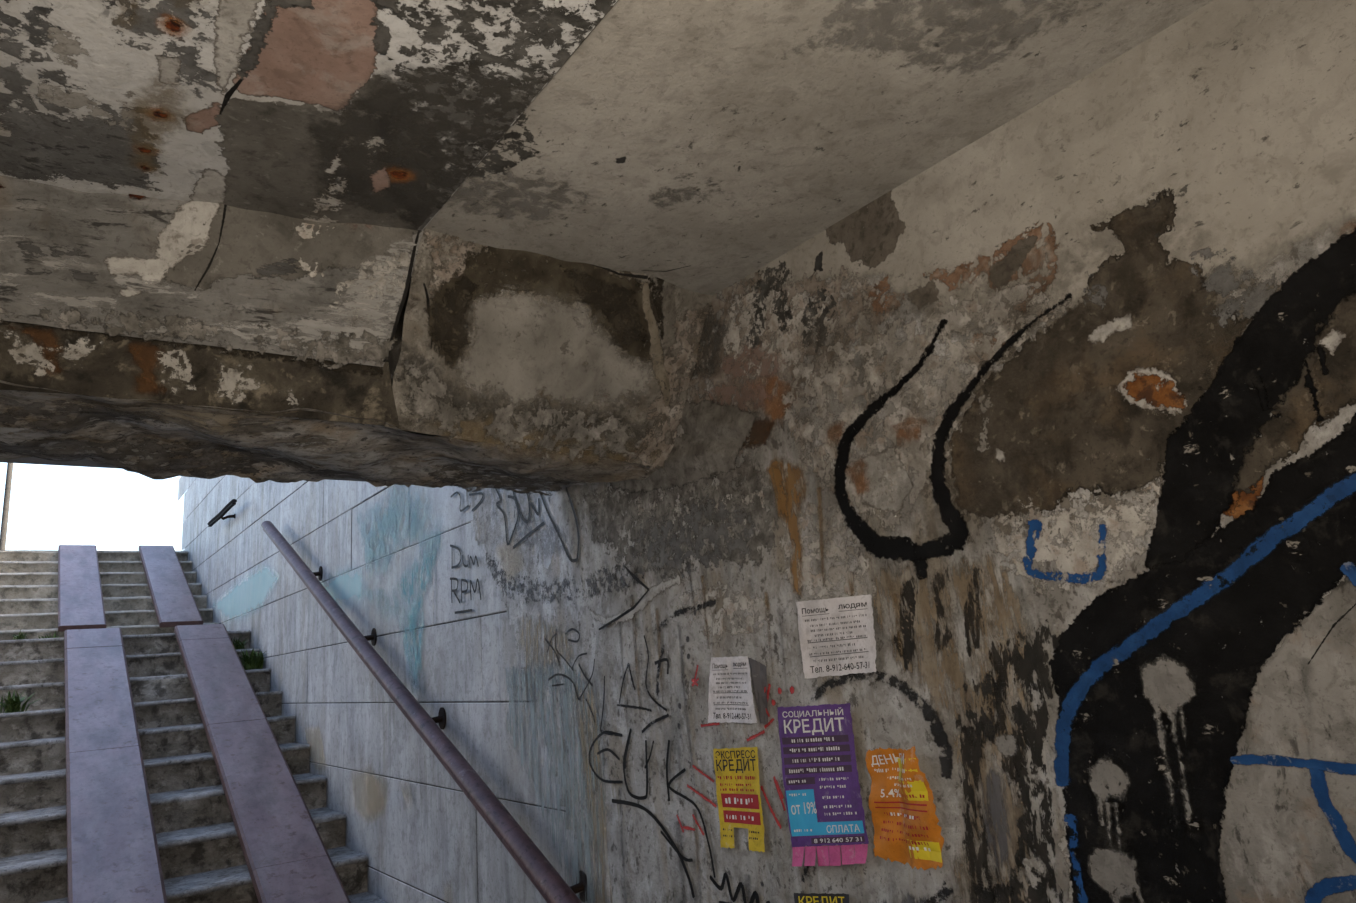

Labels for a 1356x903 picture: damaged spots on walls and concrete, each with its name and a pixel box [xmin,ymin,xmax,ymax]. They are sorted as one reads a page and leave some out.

corrosion [146,108,170,120]
crack [220,79,243,114]
crack [194,205,227,291]
leakage [401,246,664,449]
spalling [0,0,1293,643]
corrosion [767,459,823,593]
leakage [873,555,1088,903]